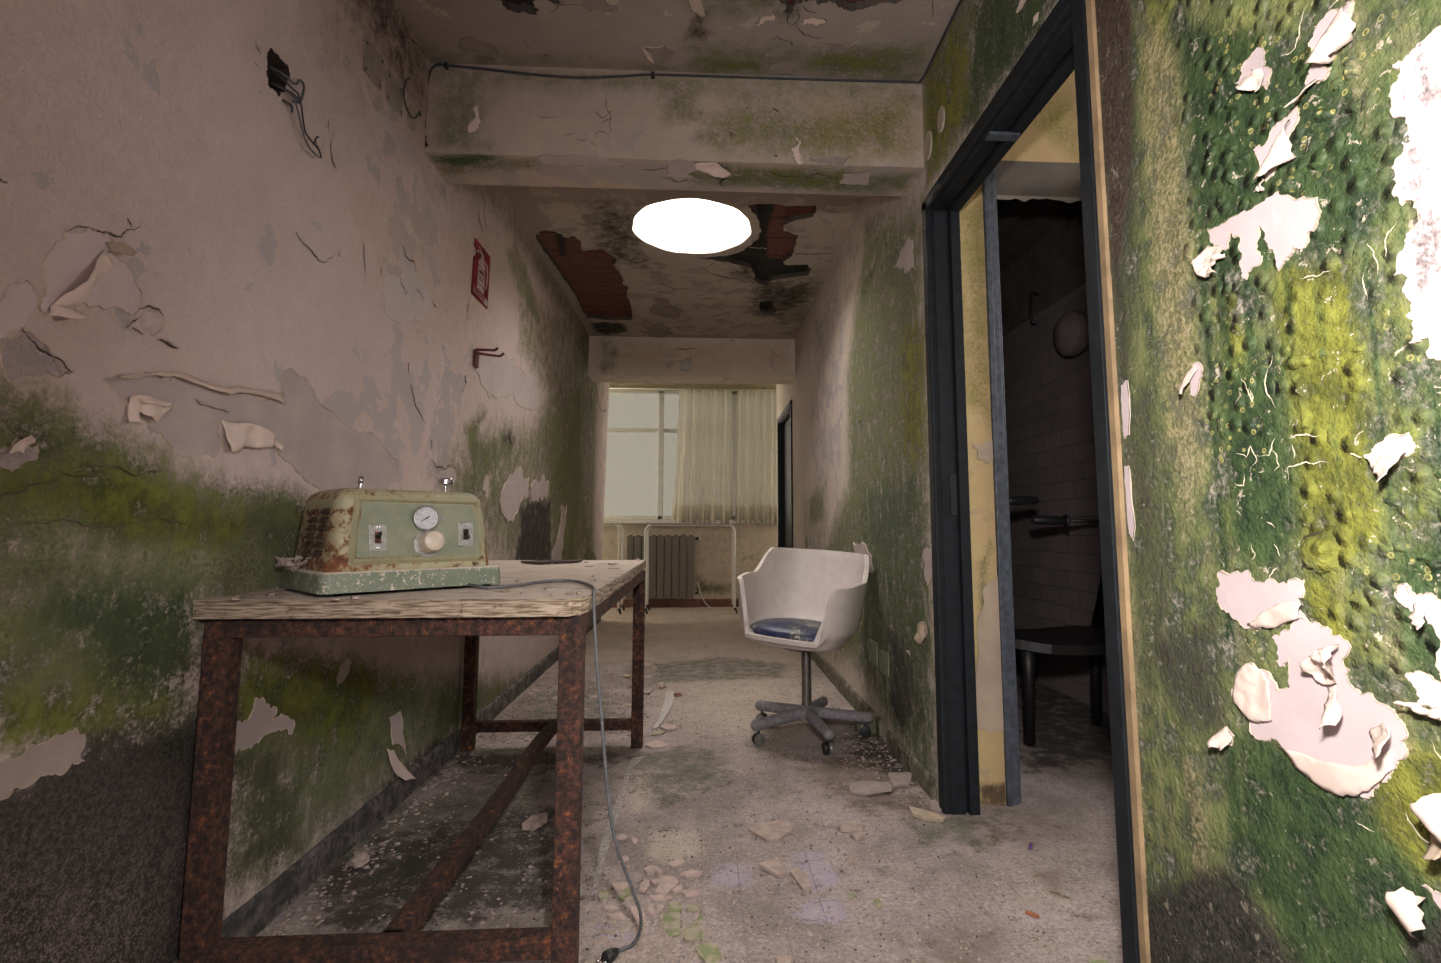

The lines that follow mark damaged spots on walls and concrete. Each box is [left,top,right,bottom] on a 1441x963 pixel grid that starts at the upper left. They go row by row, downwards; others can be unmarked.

peeling [1190,0,1356,280]
leakage [1095,0,1217,509]
peeling [1388,25,1441,378]
peeling [1363,432,1416,482]
peeling [1207,570,1441,799]
leakage [440,748,556,773]
leakage [223,723,449,920]
peeling [1410,793,1441,860]
leakage [285,842,454,935]
leakage [1146,852,1234,963]
leakage [1379,884,1441,963]
peeling [1385,884,1441,940]